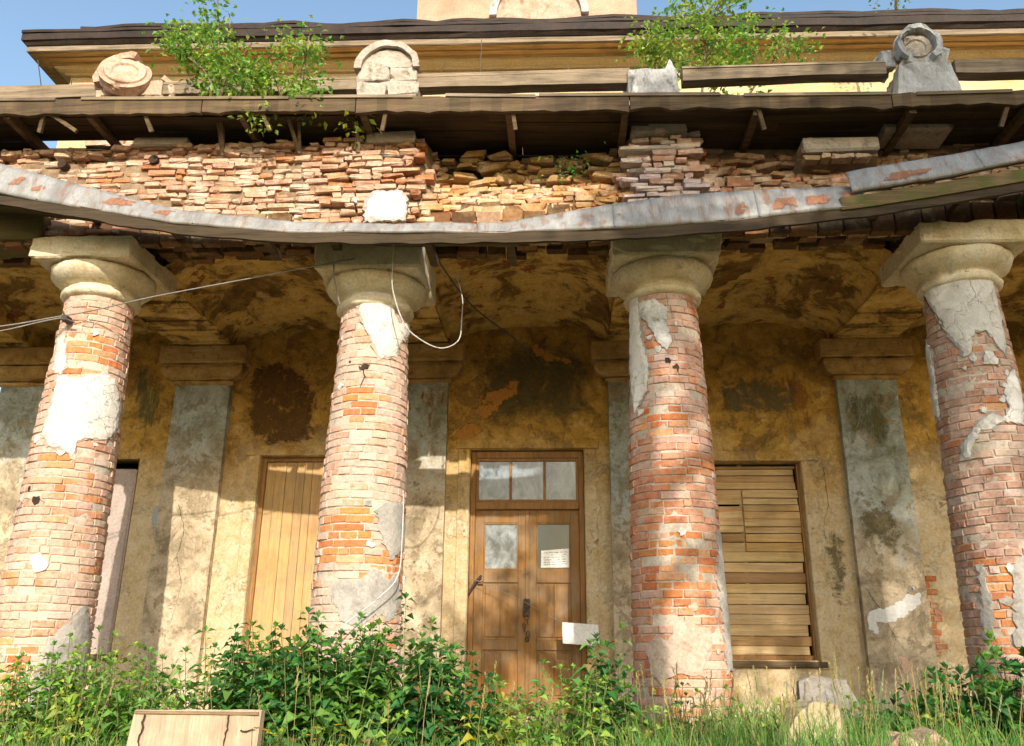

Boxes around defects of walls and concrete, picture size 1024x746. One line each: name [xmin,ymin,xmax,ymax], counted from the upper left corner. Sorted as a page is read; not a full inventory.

spalling [0,140,325,165]
flaking render [354,188,409,223]
spalling [432,150,622,223]
flaking render [34,326,122,469]
water stain [245,361,317,446]
flaking render [349,292,410,370]
flaking render [629,297,688,437]
water stain [721,377,796,416]
flaking render [919,270,1024,461]
flaking render [318,500,405,584]
flaking render [639,527,721,684]
spalling [867,576,948,656]